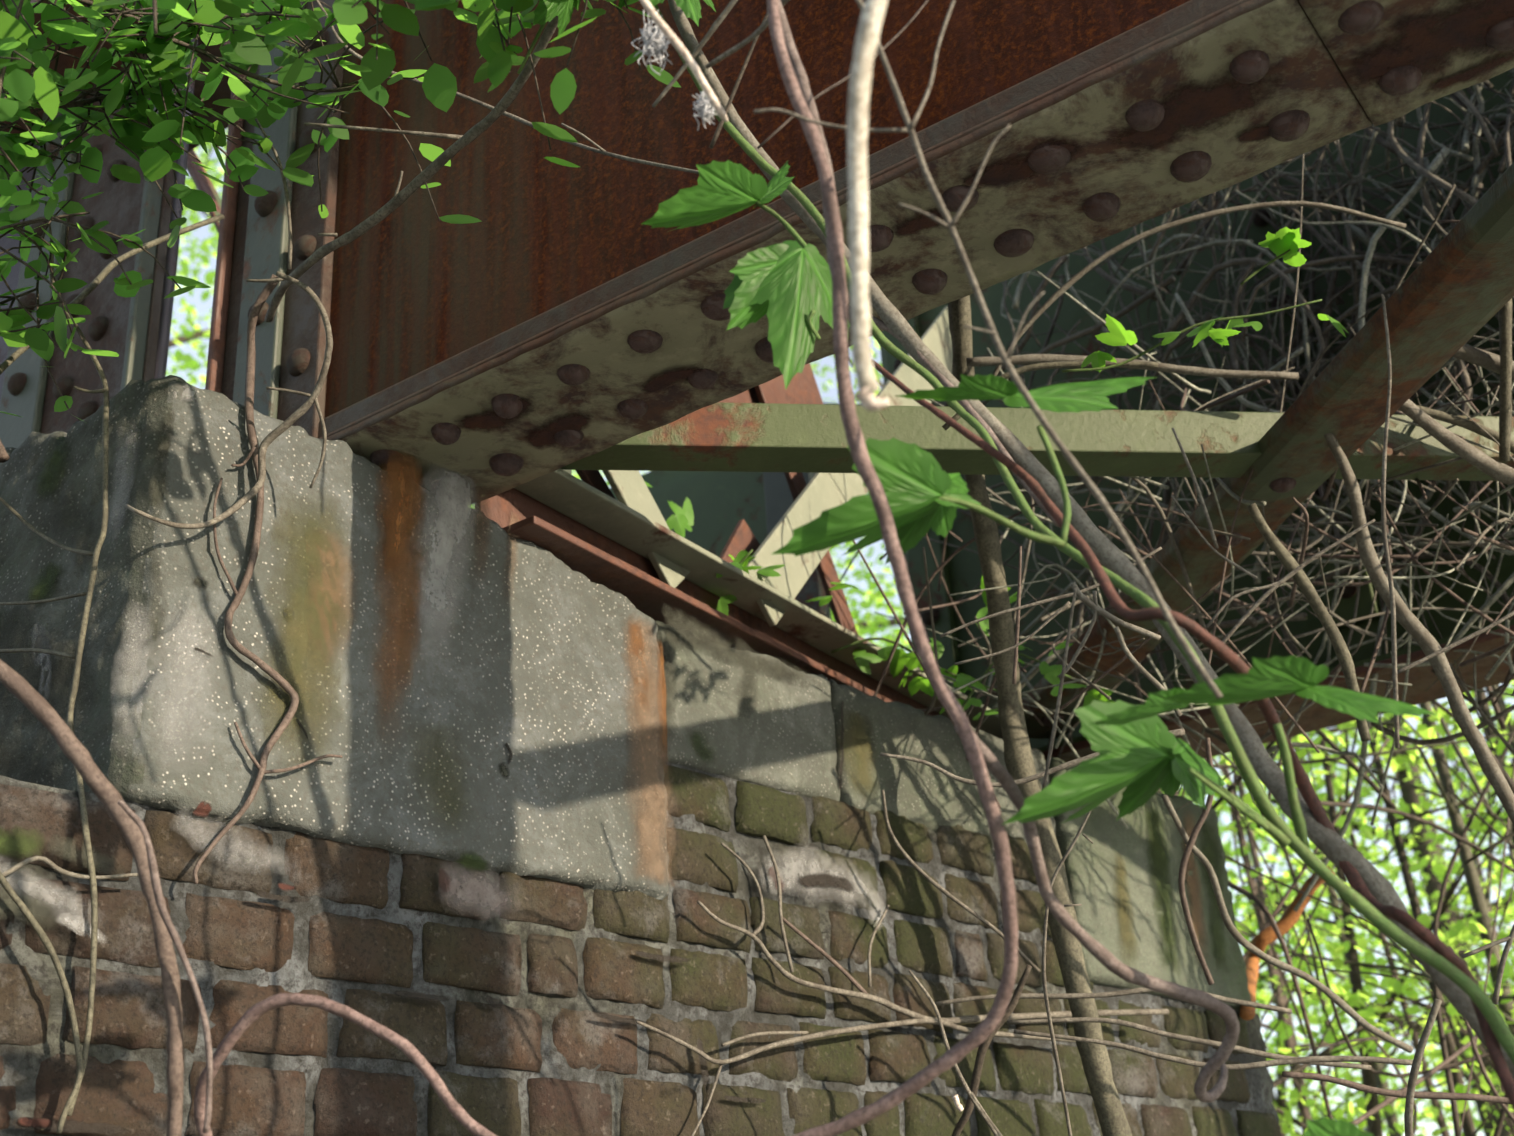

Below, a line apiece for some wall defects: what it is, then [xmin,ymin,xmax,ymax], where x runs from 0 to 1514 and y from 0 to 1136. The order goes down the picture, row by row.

corrosion [475,490,488,538]
corrosion [628,622,668,881]
leakage [440,852,513,917]